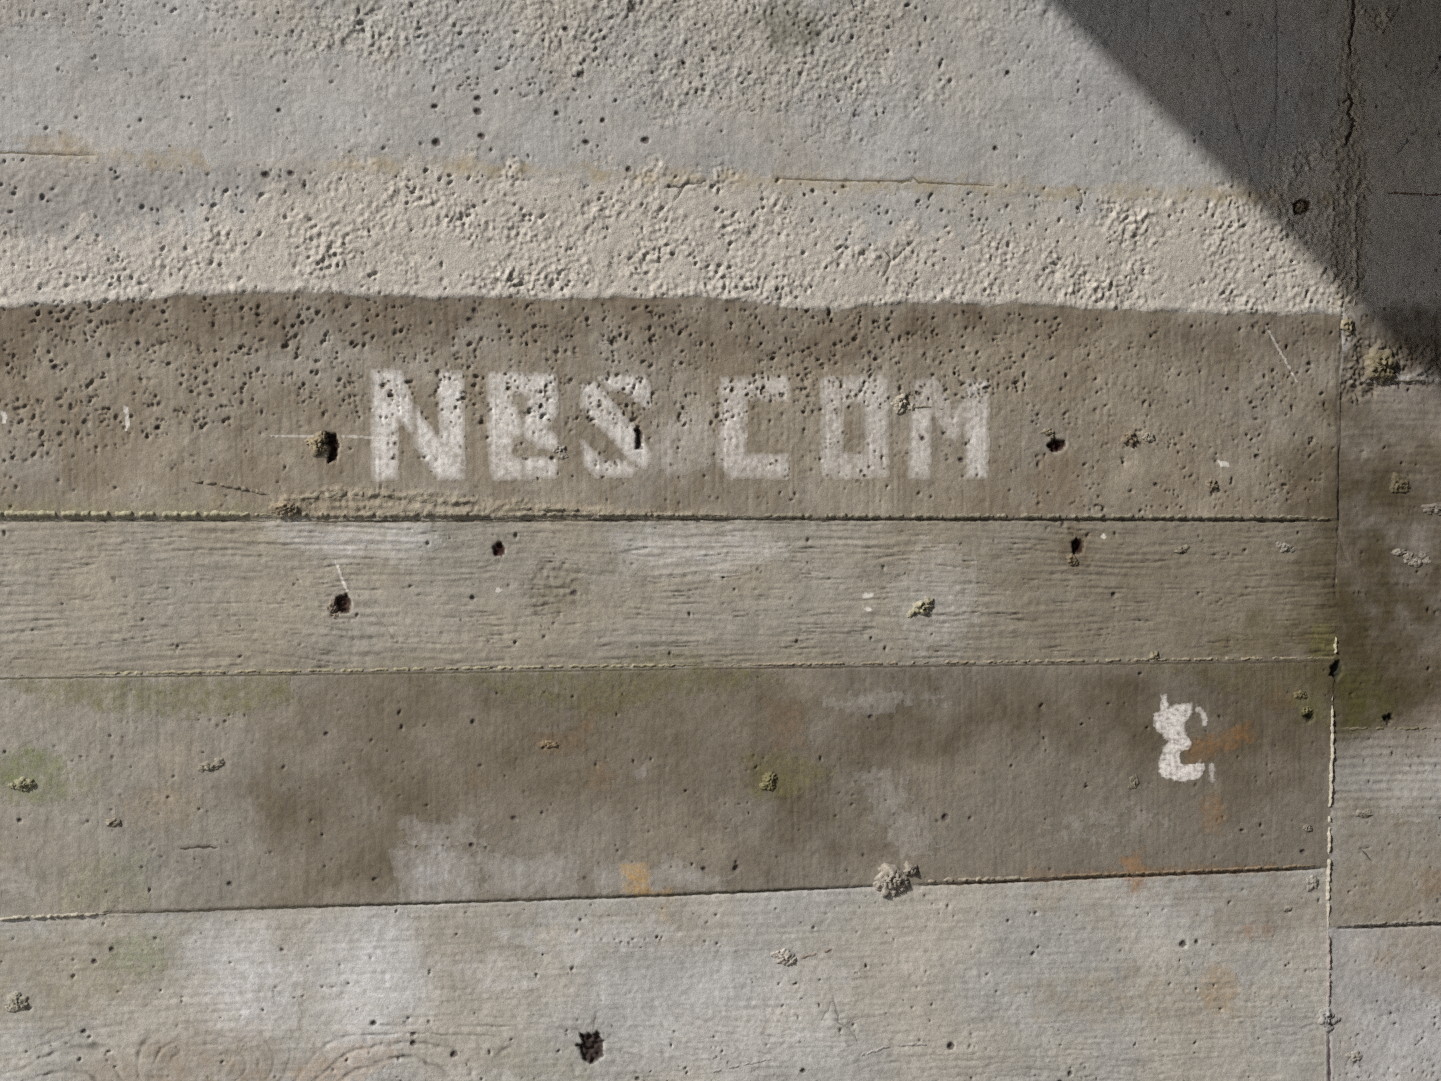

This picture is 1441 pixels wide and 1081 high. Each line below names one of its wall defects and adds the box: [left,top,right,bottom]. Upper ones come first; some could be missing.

crack [1342,93,1358,144]
water stain [0,291,1441,1081]
corrosion [1182,719,1259,764]